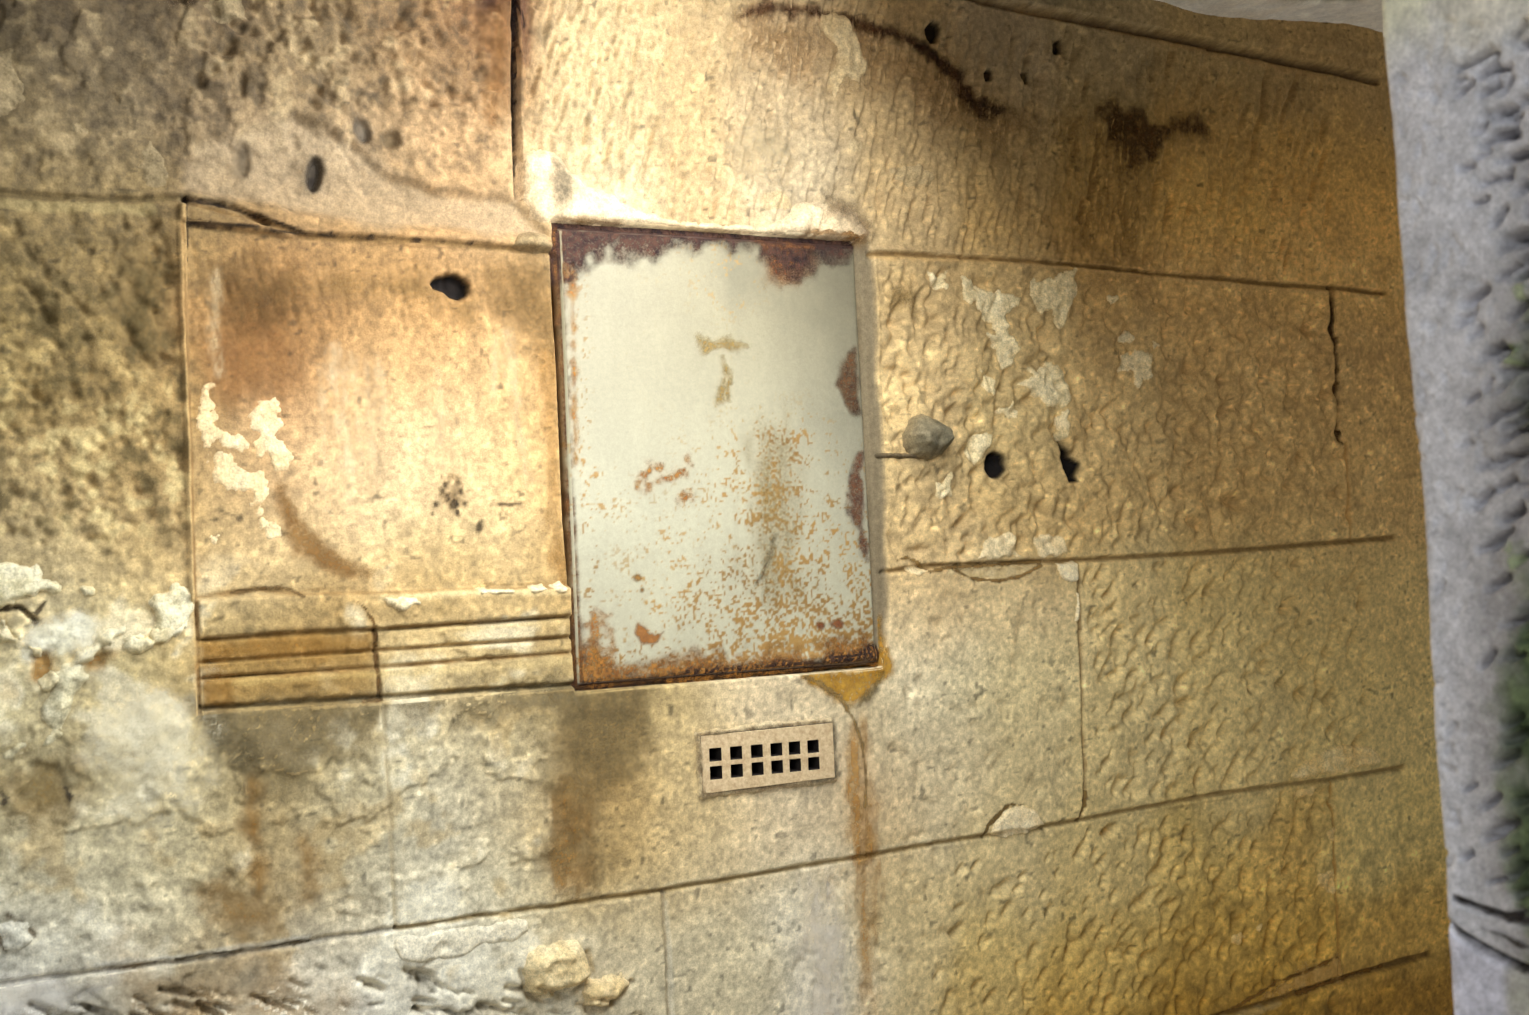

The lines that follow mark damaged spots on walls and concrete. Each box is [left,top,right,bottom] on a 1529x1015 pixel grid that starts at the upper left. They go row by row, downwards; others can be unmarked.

water stain [741,0,1005,120]
water stain [1099,105,1207,169]
rust [549,218,865,460]
peeling [0,562,195,693]
rust [565,452,892,702]
spalling [15,763,61,809]
water stain [203,700,378,837]
water stain [403,695,431,717]
water stain [457,685,645,887]
rust [847,723,875,981]